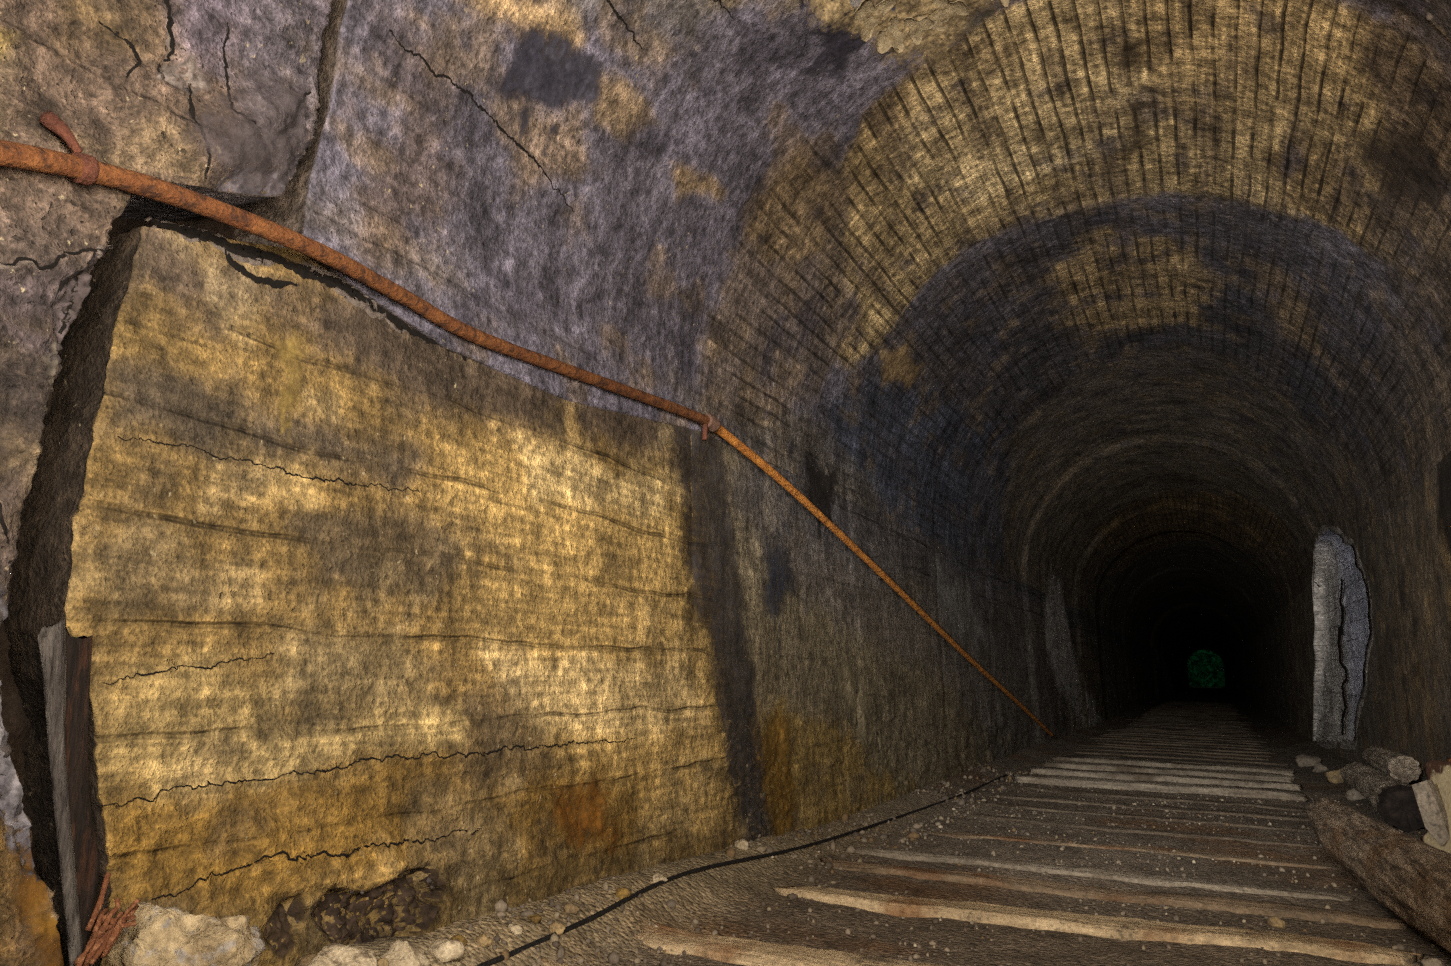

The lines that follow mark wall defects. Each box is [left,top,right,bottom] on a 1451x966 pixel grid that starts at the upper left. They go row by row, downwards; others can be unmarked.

flaking render [802,0,1009,68]
crack [98,0,311,179]
crack [0,216,467,361]
crack [118,436,419,492]
crack [0,503,10,543]
crack [102,652,274,685]
damp [675,426,767,841]
crack [0,621,38,872]
crack [100,738,635,807]
crack [152,828,482,900]
spalling [263,863,445,959]